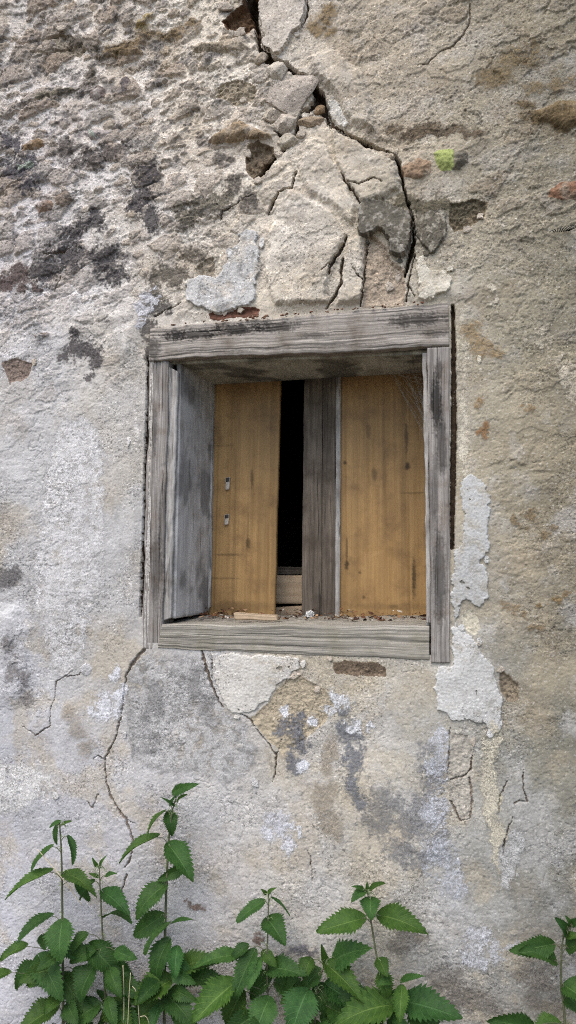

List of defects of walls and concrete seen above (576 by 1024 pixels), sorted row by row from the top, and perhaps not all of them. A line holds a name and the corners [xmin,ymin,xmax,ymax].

crack [422,5,471,65]
crack [245,0,416,309]
peeling [185,229,265,321]
spalling [357,197,489,308]
peeling [433,307,519,820]
crack [33,672,81,736]
crack [88,649,146,892]
peeling [123,652,334,787]
crack [201,650,278,777]
water stain [272,688,468,904]
crack [447,731,473,821]
crack [498,774,528,848]